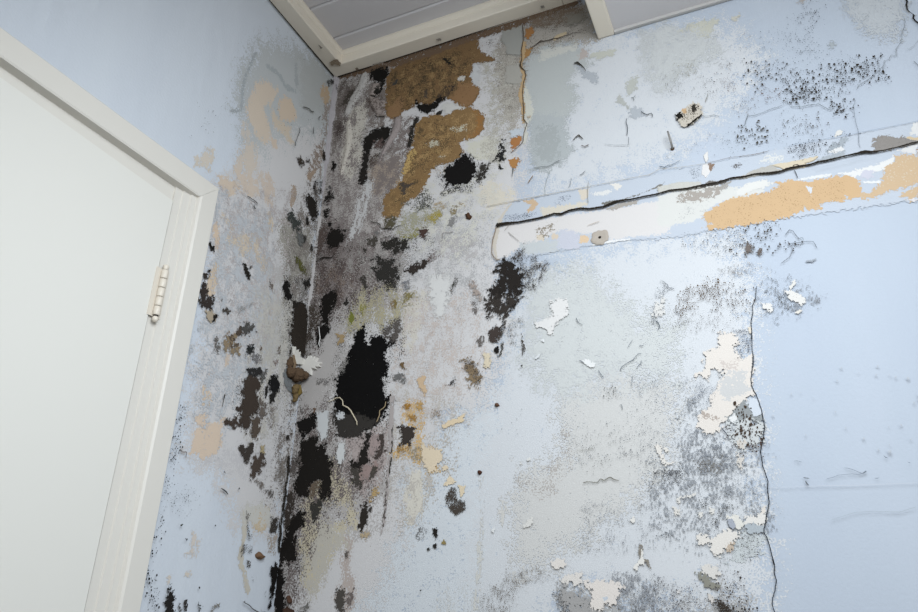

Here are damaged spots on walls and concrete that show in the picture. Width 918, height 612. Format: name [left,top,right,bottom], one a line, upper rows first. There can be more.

damp [839,0,917,46]
flaking render [382,39,495,219]
crack [269,0,918,260]
spalling [590,122,918,211]
damp [161,0,892,612]
spalling [724,399,767,454]
crack [750,286,777,612]
damp [144,566,220,612]